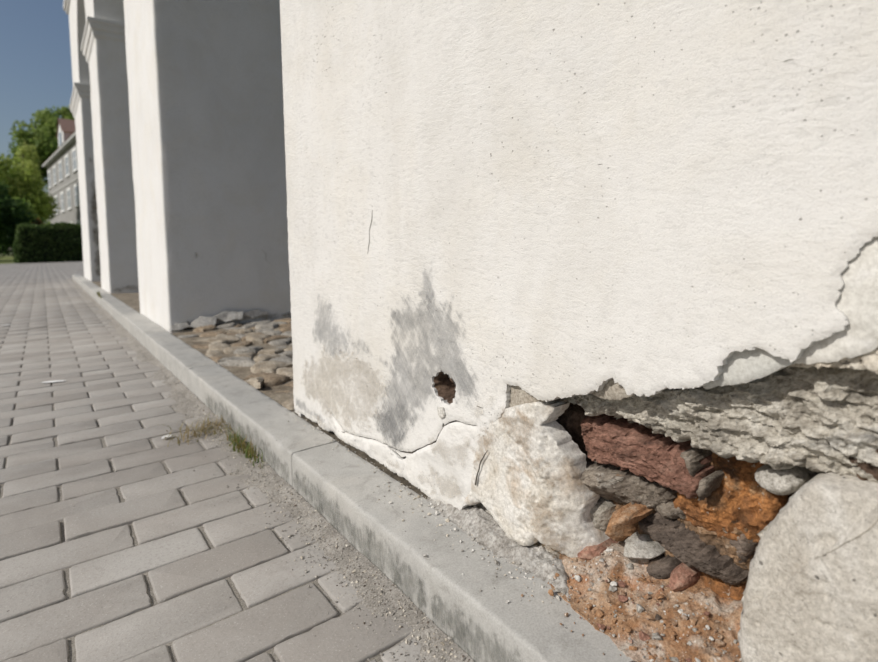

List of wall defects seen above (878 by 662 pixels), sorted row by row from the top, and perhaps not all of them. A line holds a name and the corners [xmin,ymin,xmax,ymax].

crack [341,406,482,459]
spalling [463,237,878,600]